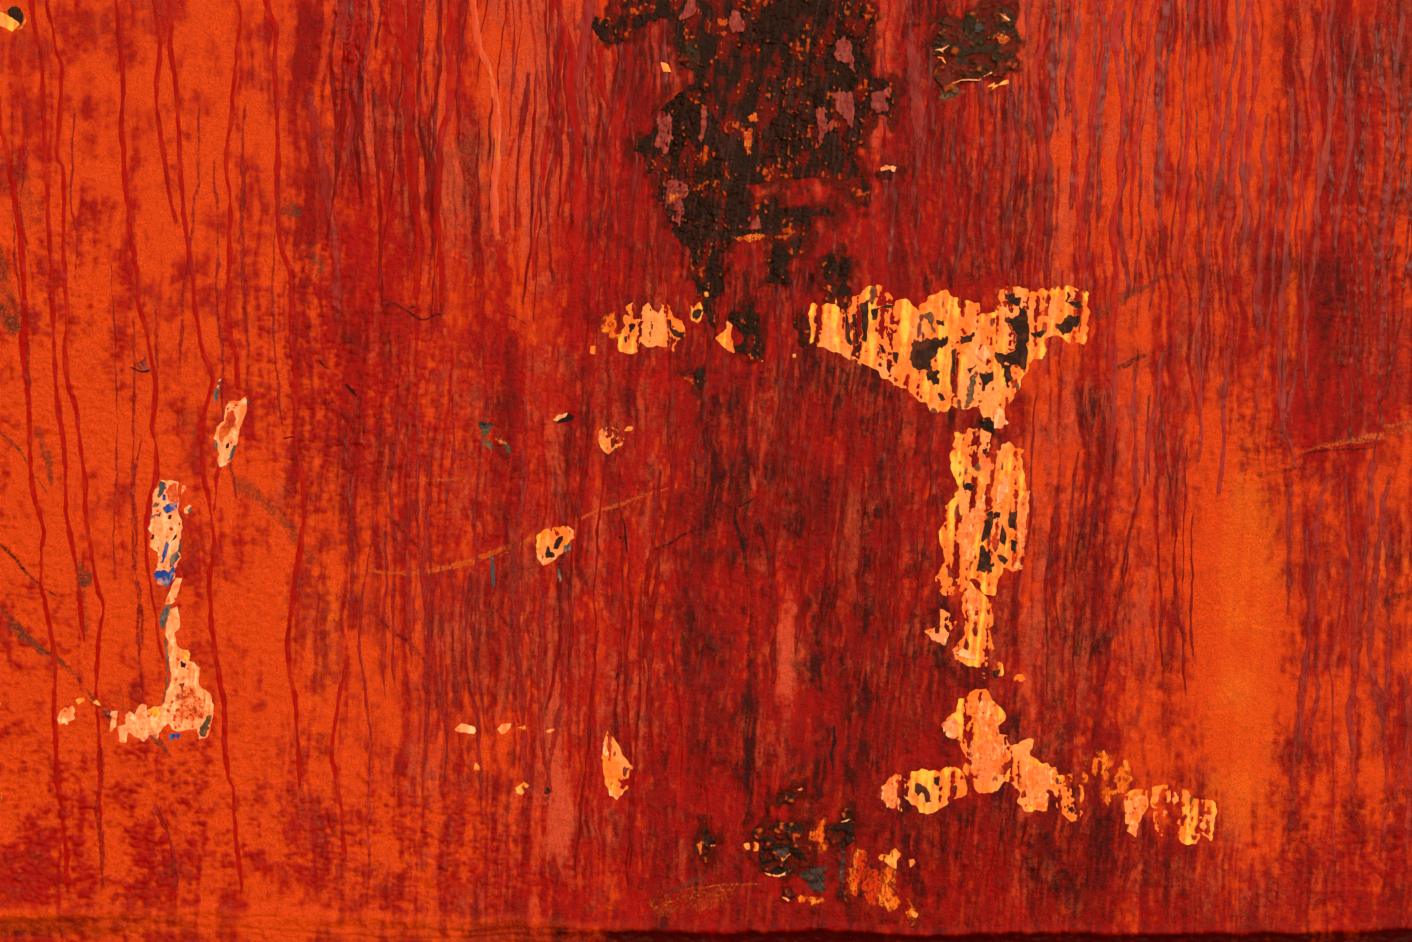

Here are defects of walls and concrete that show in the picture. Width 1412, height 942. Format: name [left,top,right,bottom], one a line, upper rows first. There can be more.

peeling [0,3,27,31]
rust [926,0,1023,101]
rust [578,0,904,365]
peeling [590,302,703,354]
peeling [209,379,250,467]
spalling [678,364,706,399]
peeling [536,526,574,565]
peeling [808,285,1217,845]
peeling [57,480,214,743]
peeling [601,731,633,800]
rust [694,814,723,868]
rust [743,780,861,892]